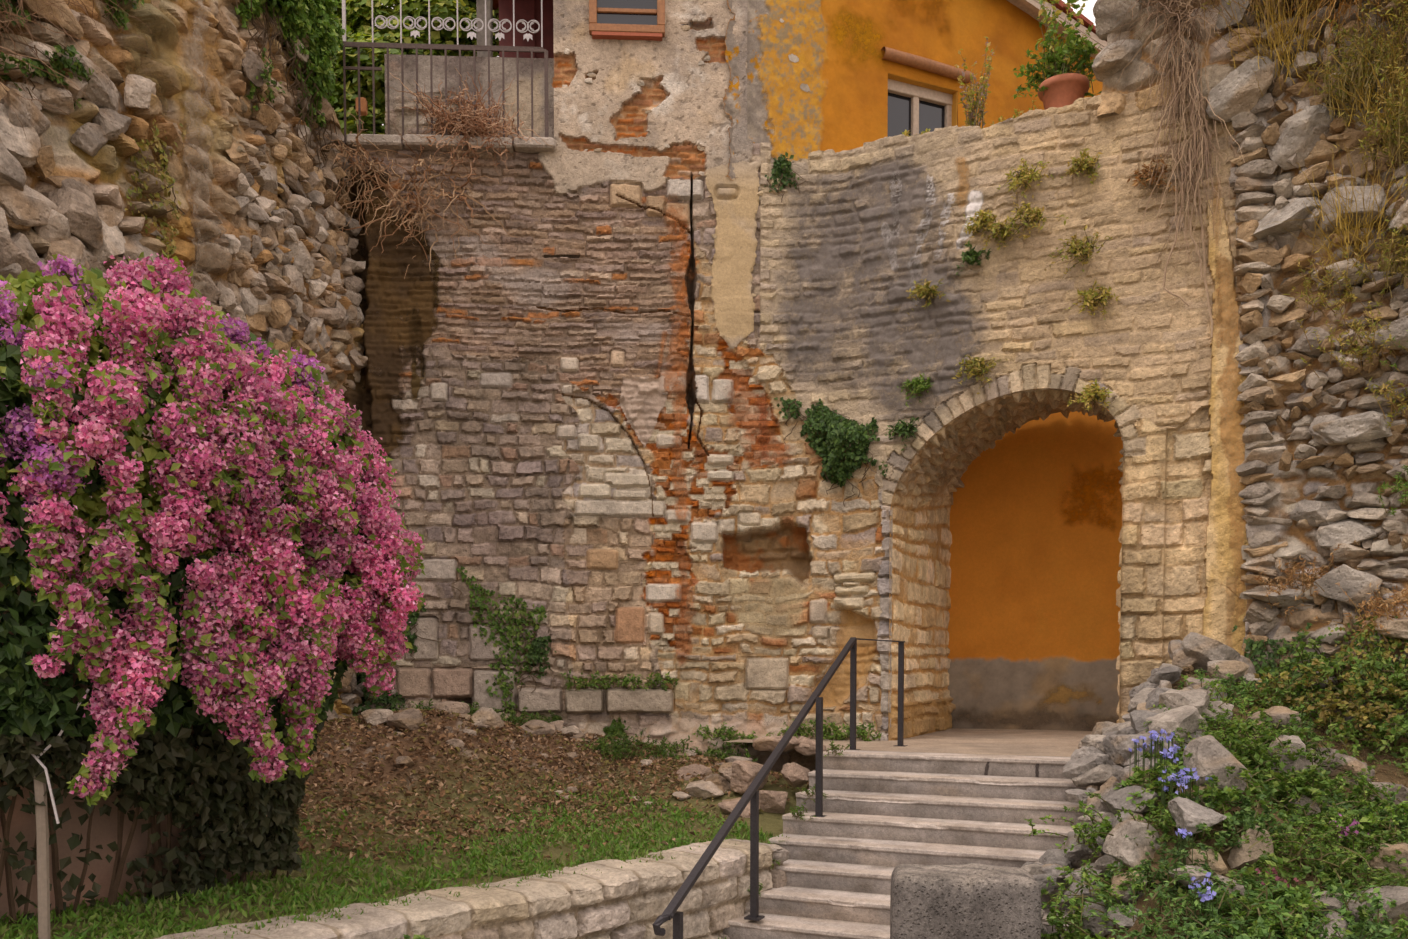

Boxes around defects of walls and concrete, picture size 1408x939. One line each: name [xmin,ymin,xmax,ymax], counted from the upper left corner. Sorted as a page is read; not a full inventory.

spalling [552,48,597,88]
peeling [560,0,785,349]
crack [536,175,710,456]
peeling [616,376,668,448]